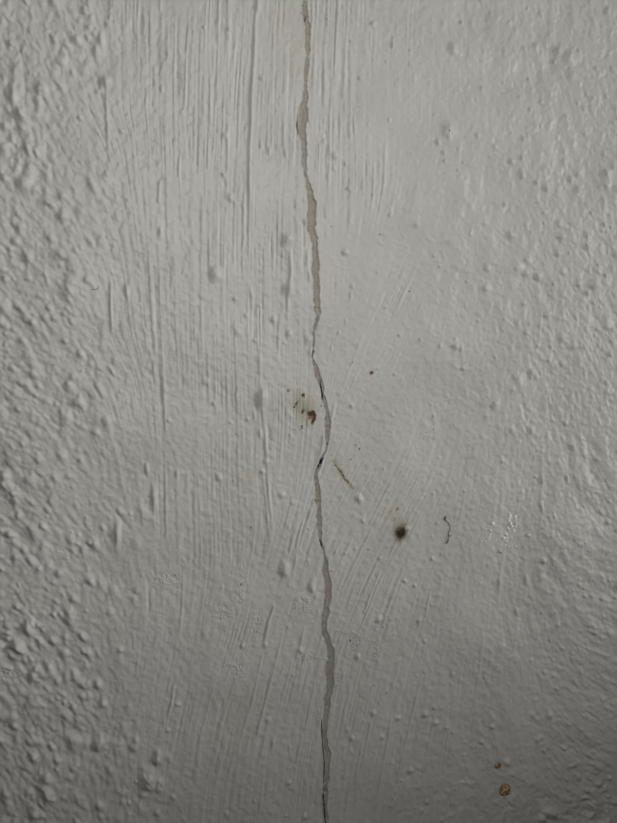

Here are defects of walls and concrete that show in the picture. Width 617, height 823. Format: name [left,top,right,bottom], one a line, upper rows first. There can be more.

crack [294,0,349,823]